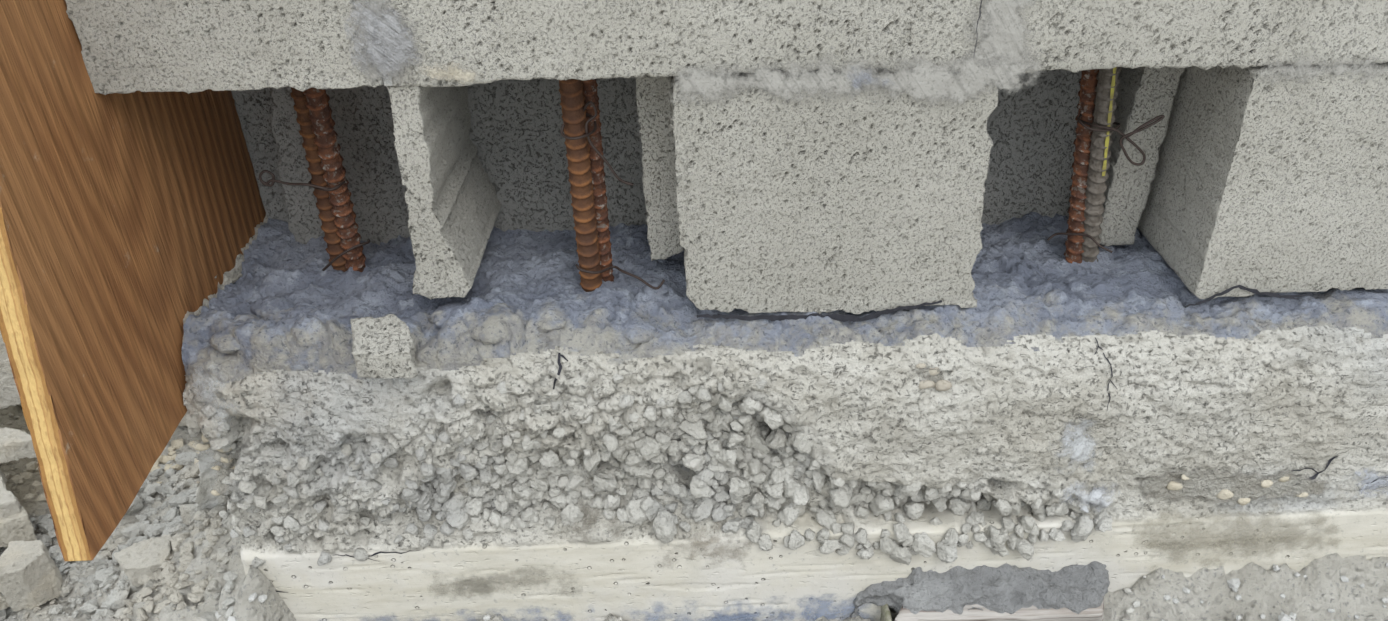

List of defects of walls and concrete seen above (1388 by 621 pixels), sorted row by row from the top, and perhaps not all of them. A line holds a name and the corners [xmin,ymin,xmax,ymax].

crack [1094,338,1117,409]